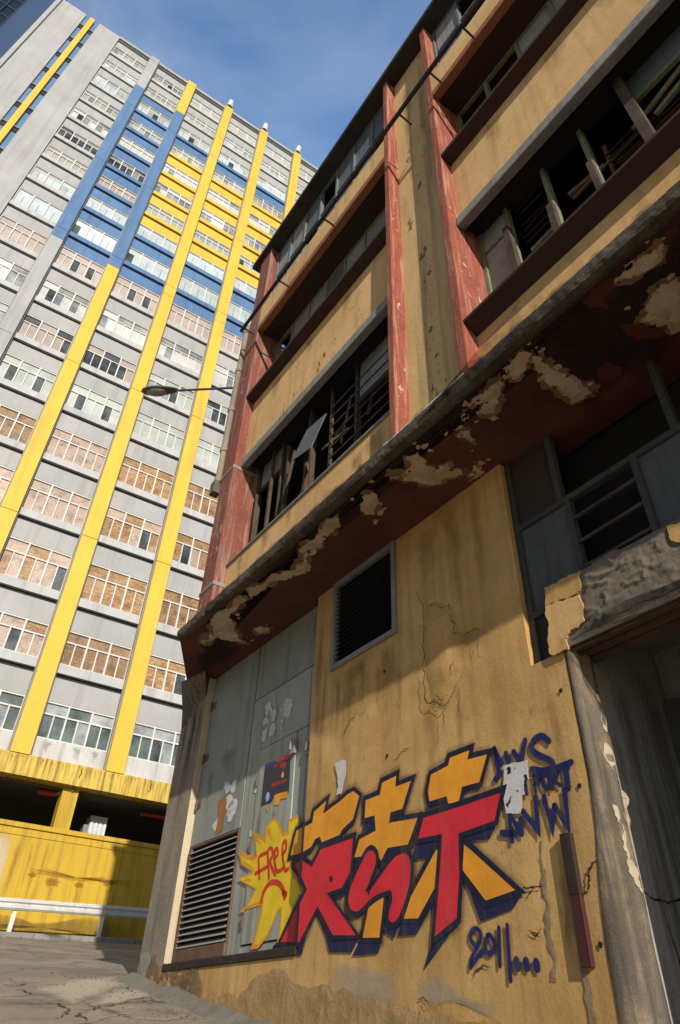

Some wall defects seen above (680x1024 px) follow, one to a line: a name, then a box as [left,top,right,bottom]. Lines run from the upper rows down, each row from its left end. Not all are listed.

peeling [605,237,680,340]
peeling [350,342,601,524]
peeling [198,514,341,646]
spalling [544,522,680,656]
crack [413,588,485,733]
peeling [595,693,643,893]
crack [583,860,598,896]